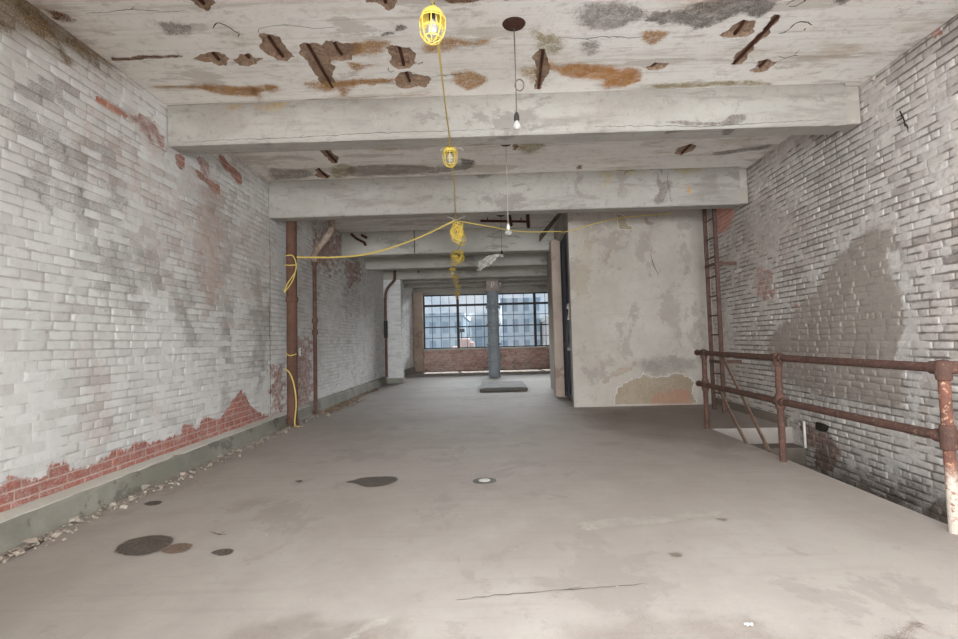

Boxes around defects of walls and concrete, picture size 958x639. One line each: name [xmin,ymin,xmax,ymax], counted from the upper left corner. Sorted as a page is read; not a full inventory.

spalling [191,0,216,11]
corrosion [149,82,289,113]
spalling [194,33,359,88]
spalling [386,45,431,89]
spalling [532,49,551,90]
corrosion [520,29,774,90]
water stain [570,0,781,57]
spalling [720,14,783,72]
peeling [95,94,242,194]
water stain [768,225,928,438]
peeling [600,361,697,404]
peeling [0,336,313,512]